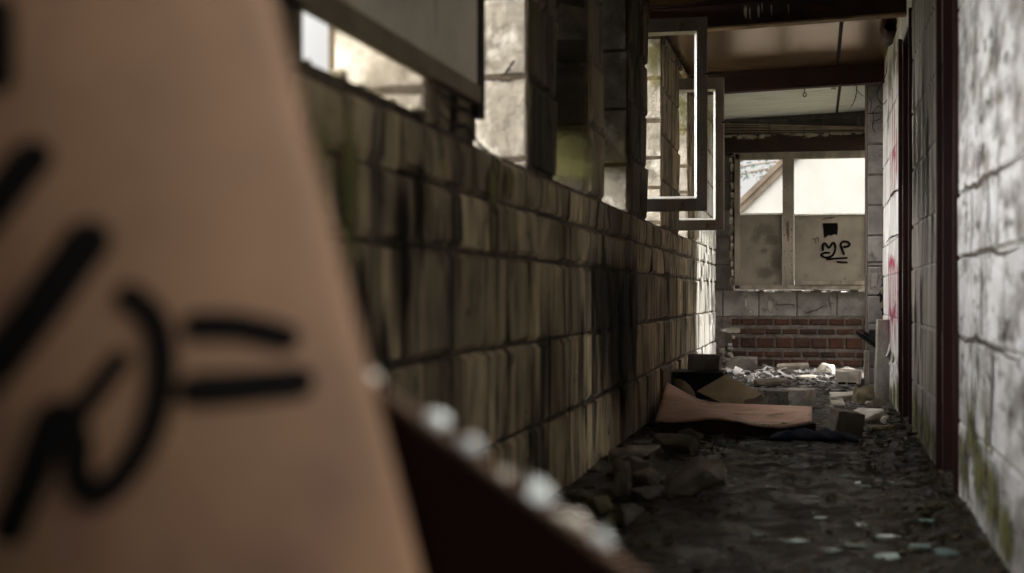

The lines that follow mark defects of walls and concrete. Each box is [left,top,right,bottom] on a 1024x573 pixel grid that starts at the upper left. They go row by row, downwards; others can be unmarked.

leakage [569,242,638,460]
crack [958,152,1024,422]